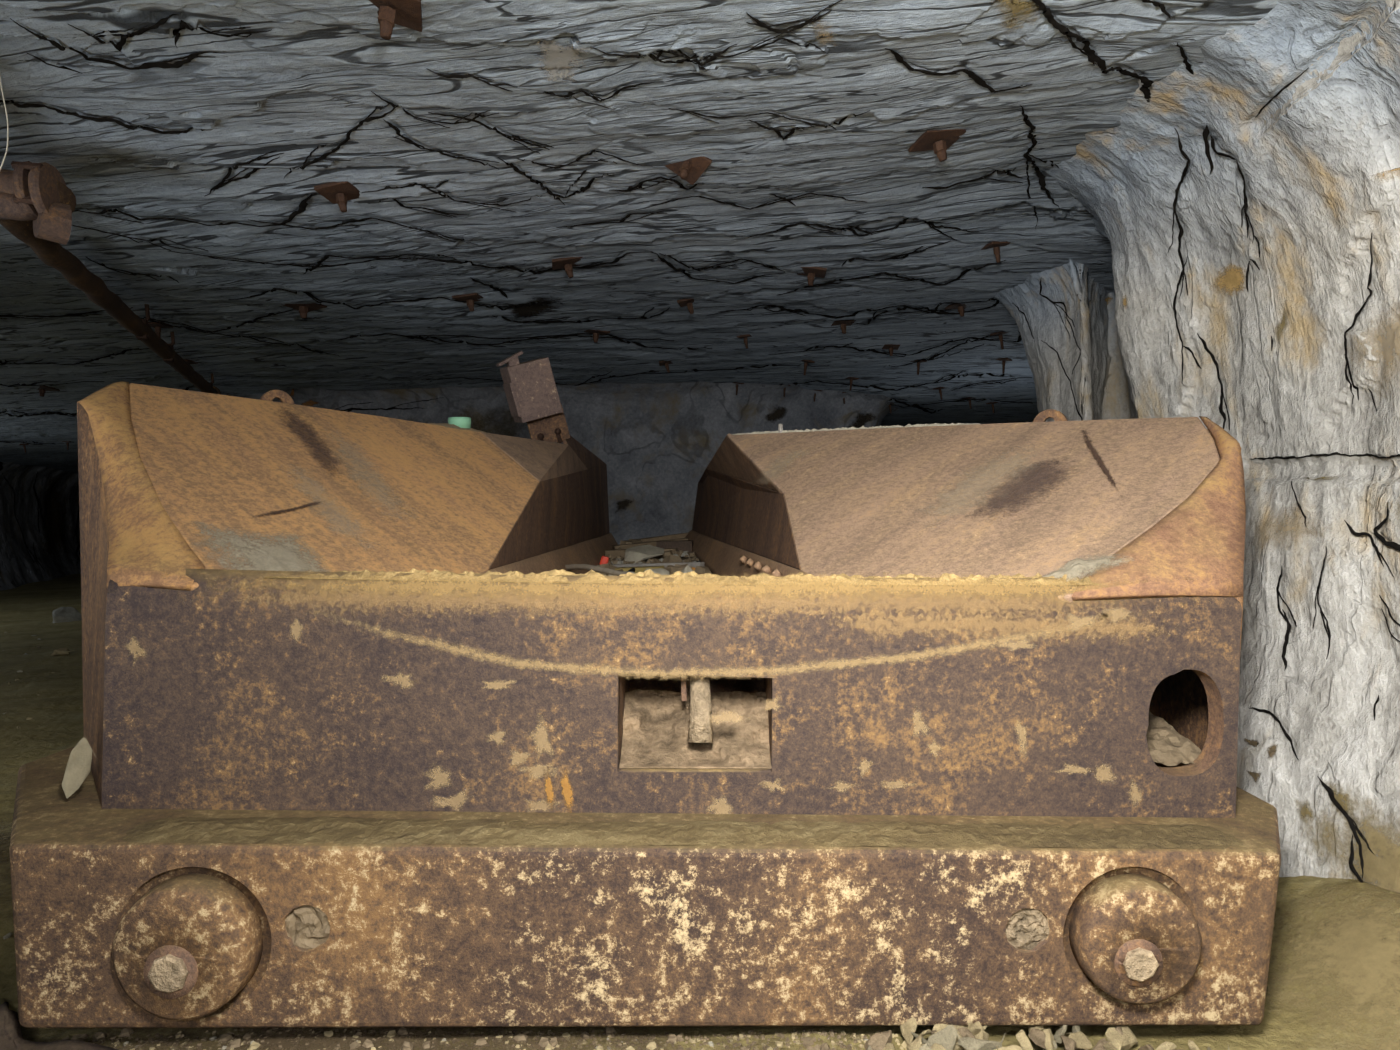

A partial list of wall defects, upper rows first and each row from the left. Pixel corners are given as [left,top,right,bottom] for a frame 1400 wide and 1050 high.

crack [1032,0,1154,102]
crack [1142,0,1194,74]
crack [1255,68,1309,118]
crack [0,0,1083,471]
crack [1168,125,1260,430]
crack [1344,233,1377,411]
crack [72,510,80,564]
crack [1252,452,1400,671]
crack [1252,707,1374,883]